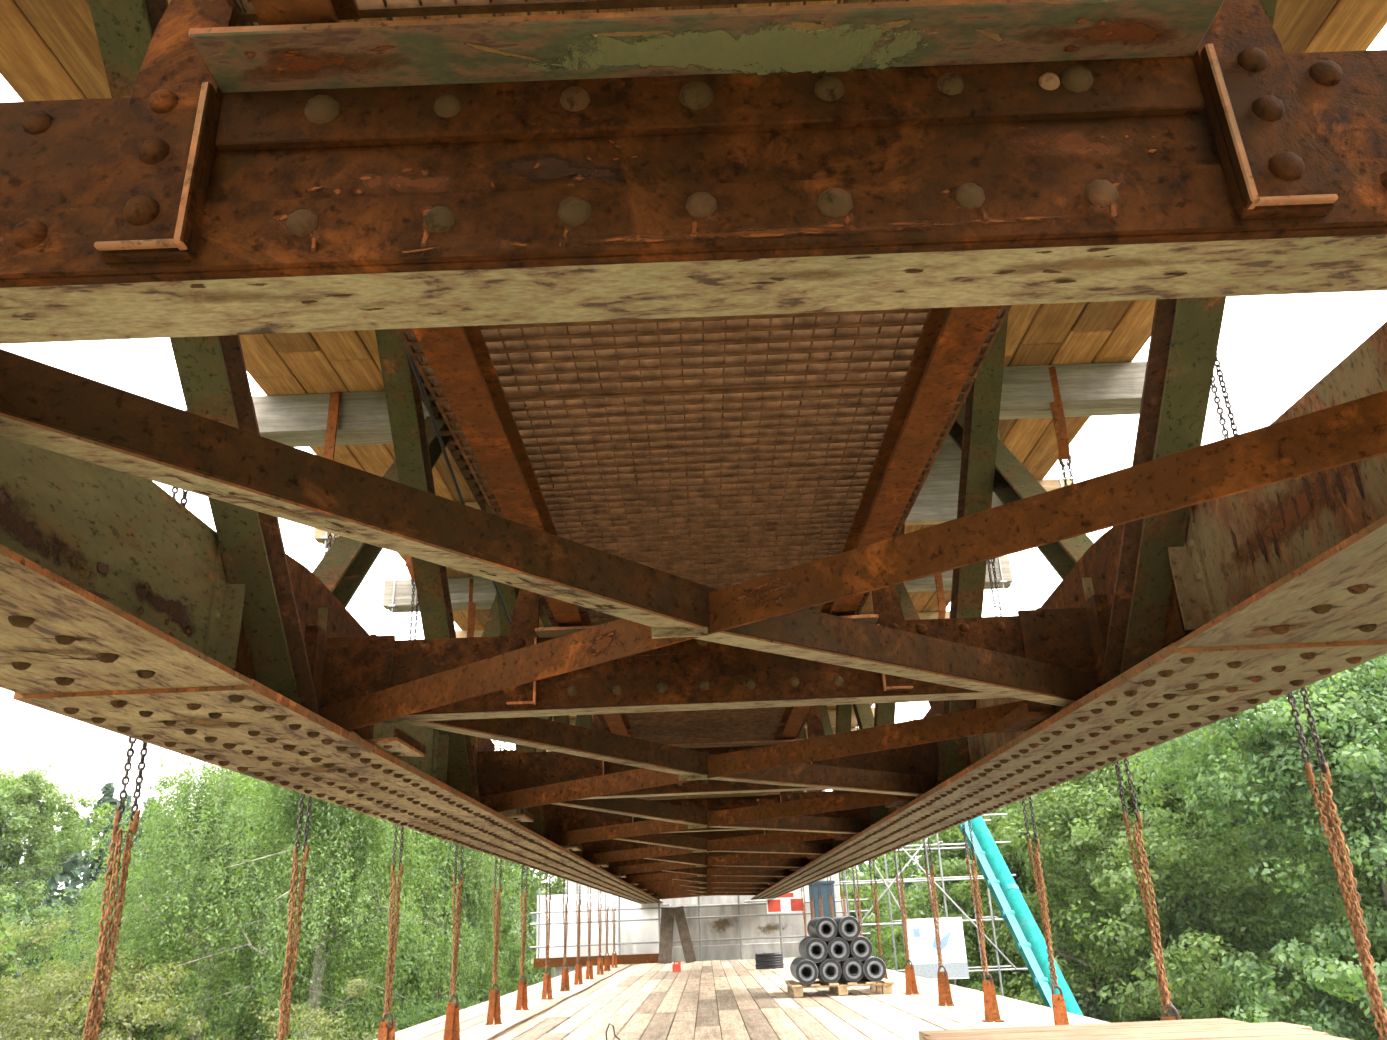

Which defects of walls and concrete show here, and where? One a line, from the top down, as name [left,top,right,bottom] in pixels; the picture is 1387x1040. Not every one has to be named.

peeling [465,19,927,75]
corrosion [1010,127,1130,160]
corrosion [309,168,457,253]
corrosion [555,190,1056,243]
corrosion [1222,463,1364,573]
corrosion [135,582,195,637]